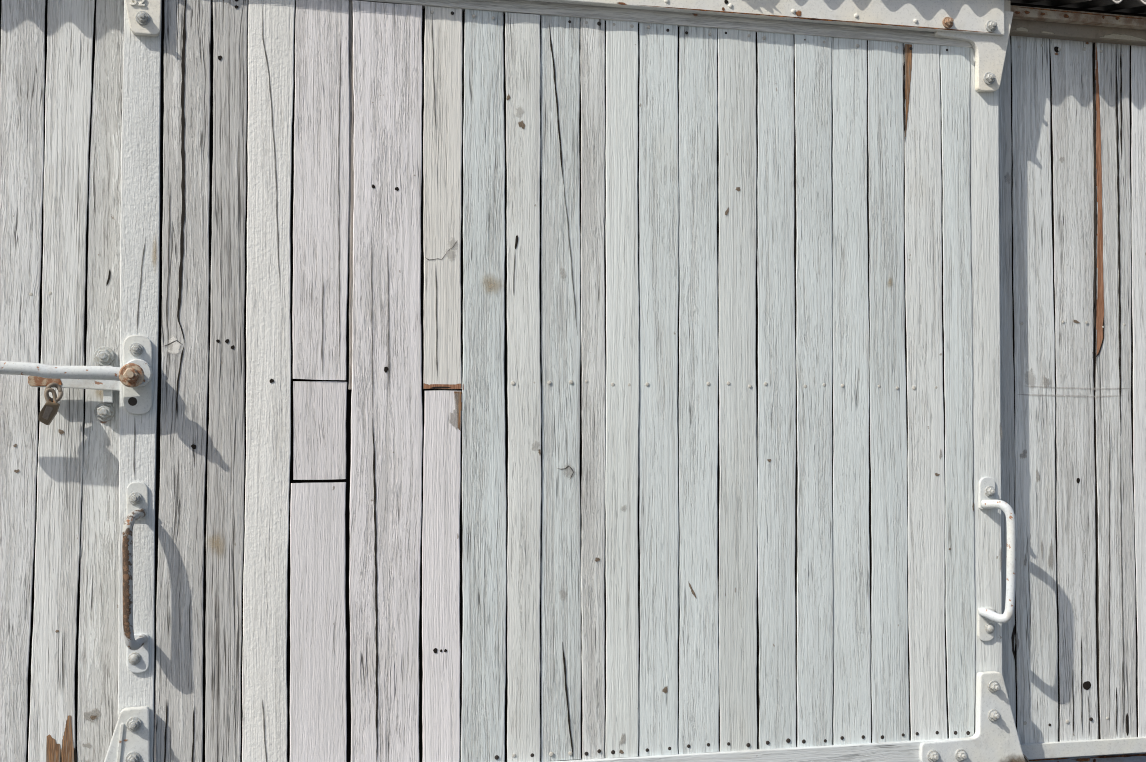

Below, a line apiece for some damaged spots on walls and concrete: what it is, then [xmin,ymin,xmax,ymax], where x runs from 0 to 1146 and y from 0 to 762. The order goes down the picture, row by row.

crack [562,642,573,756]